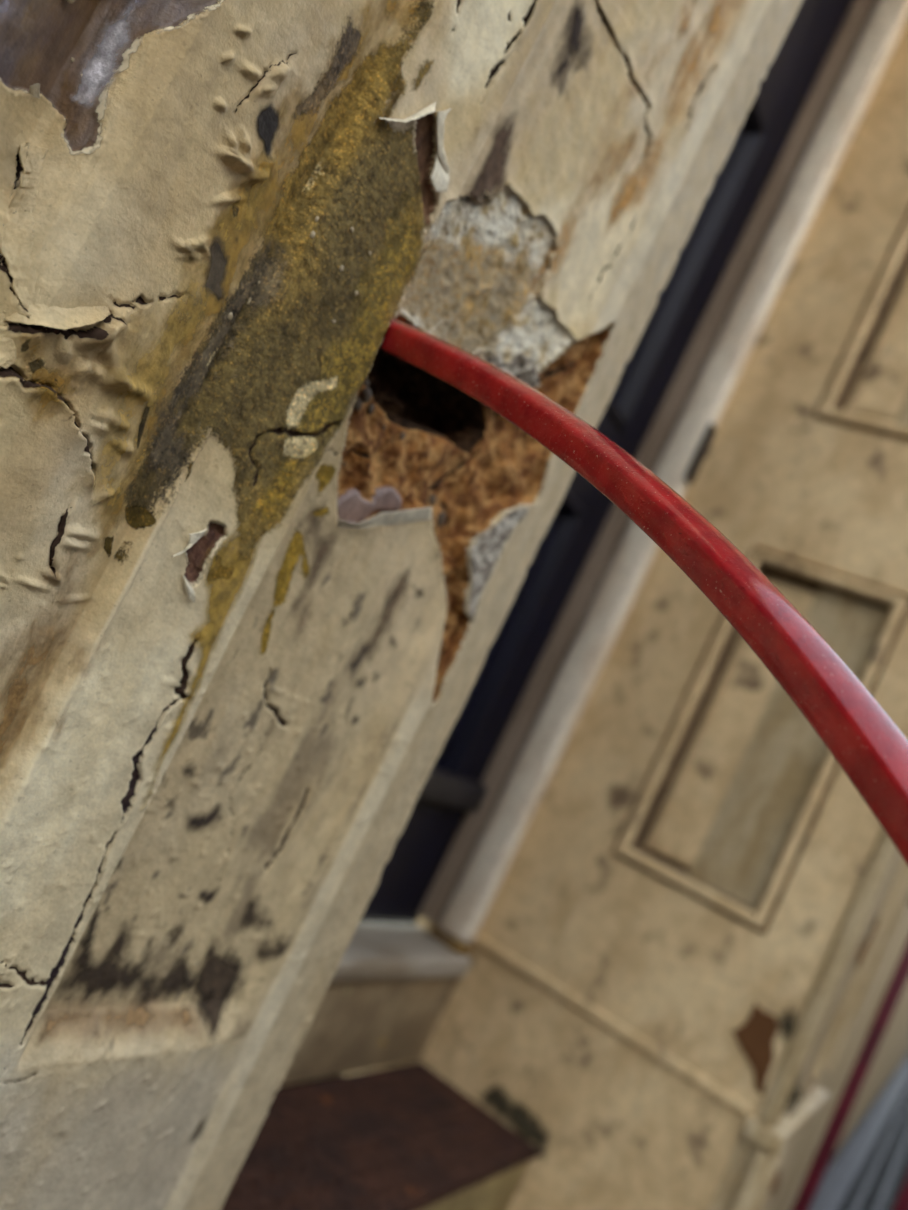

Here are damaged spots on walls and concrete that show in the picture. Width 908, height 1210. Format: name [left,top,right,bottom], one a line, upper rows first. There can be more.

peeling [0,0,224,155]
leakage [382,60,433,118]
crack [480,0,549,108]
crack [596,0,651,158]
crack [687,67,715,128]
leakage [95,5,370,562]
leakage [26,340,66,410]
spalling [336,102,614,708]
spalling [172,522,228,602]
crack [0,640,196,1083]
spalling [734,1002,780,1095]